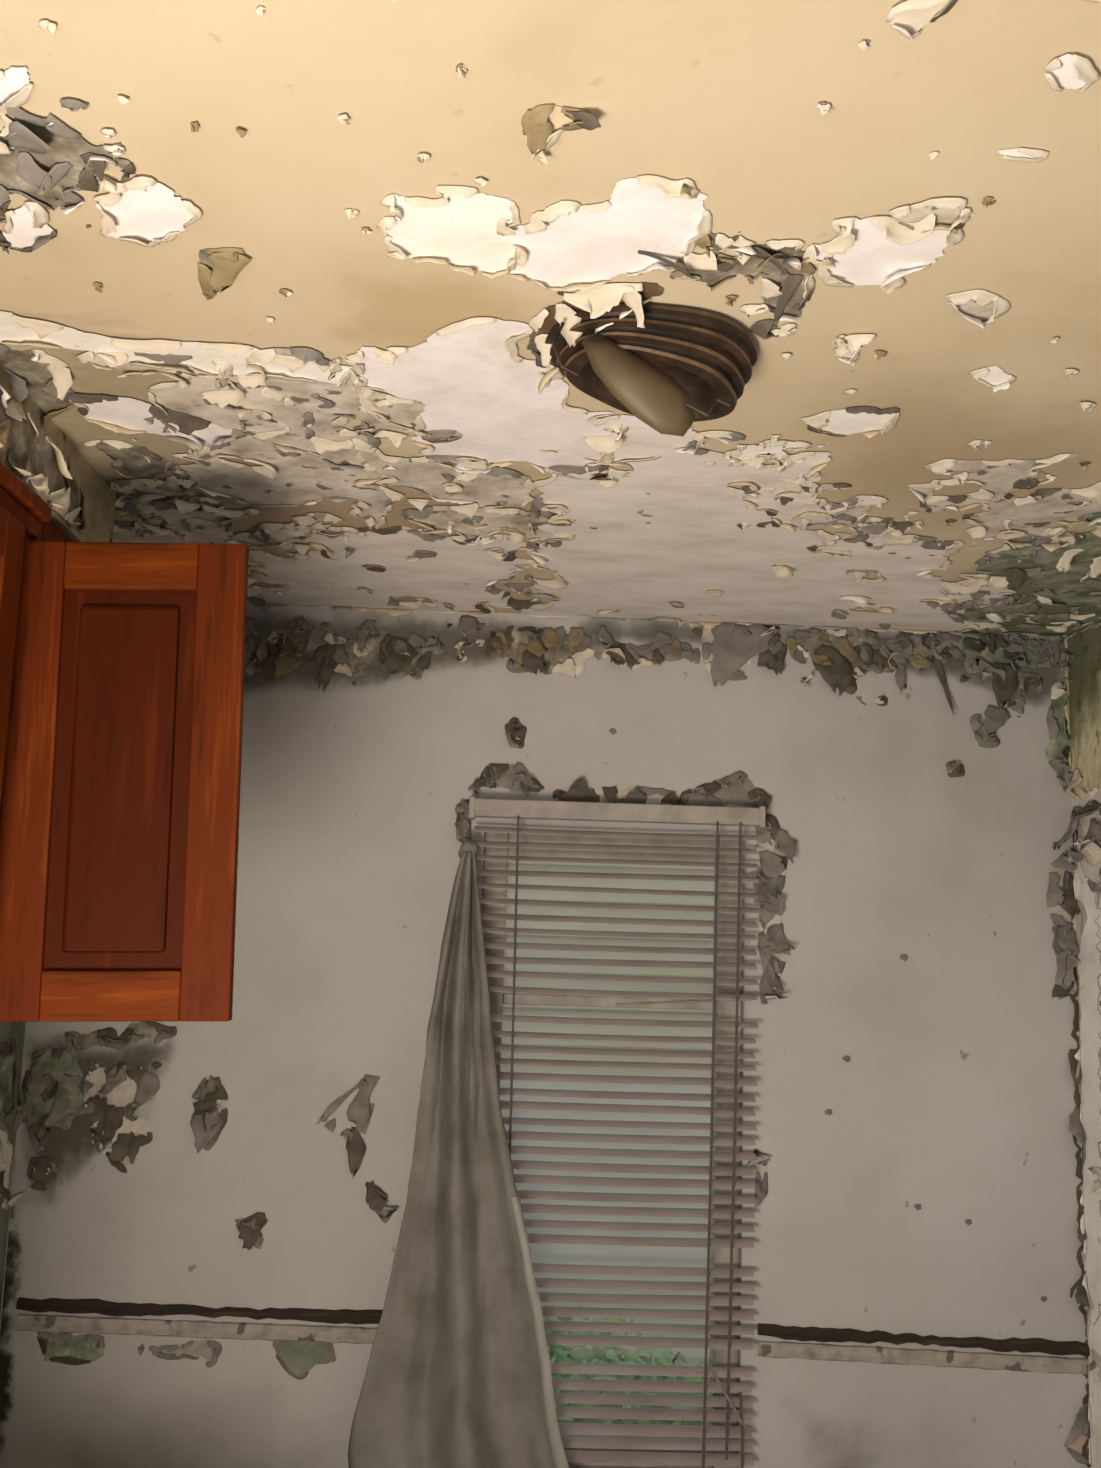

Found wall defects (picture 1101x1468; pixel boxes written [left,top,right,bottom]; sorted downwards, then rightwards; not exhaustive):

peeling [886,0,958,41]
peeling [0,67,202,254]
peeling [0,175,1101,801]
leakage [244,617,507,688]
leakage [583,623,702,641]
leakage [988,555,1101,726]
peeling [454,717,797,1005]
peeling [0,1021,177,1211]
peeling [190,1076,228,1153]
peeling [235,1212,268,1250]
peeling [315,1075,398,1224]
peeling [1047,800,1101,1468]